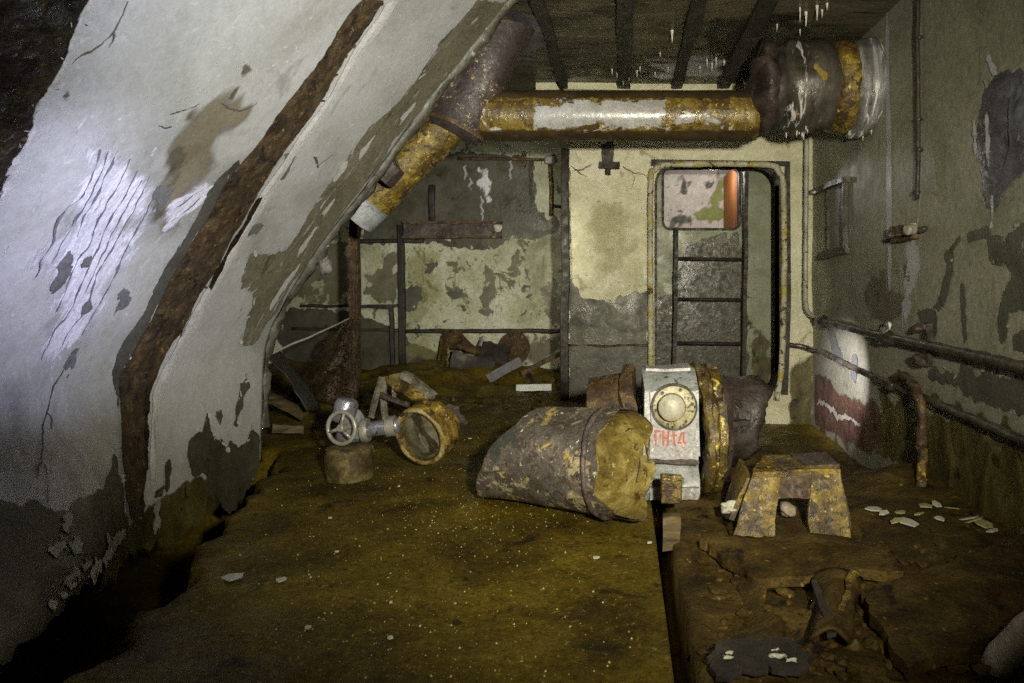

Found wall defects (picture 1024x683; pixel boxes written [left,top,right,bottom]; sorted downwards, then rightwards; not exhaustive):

crack [73,1,129,63]
water stain [32,87,258,378]
flaking render [112,160,240,408]
corrosion [205,195,263,291]
peeling [240,0,505,346]
peeling [363,151,571,316]
crack [36,357,73,507]
peeling [155,459,172,498]
peeling [187,373,260,514]
corrosion [814,374,886,454]